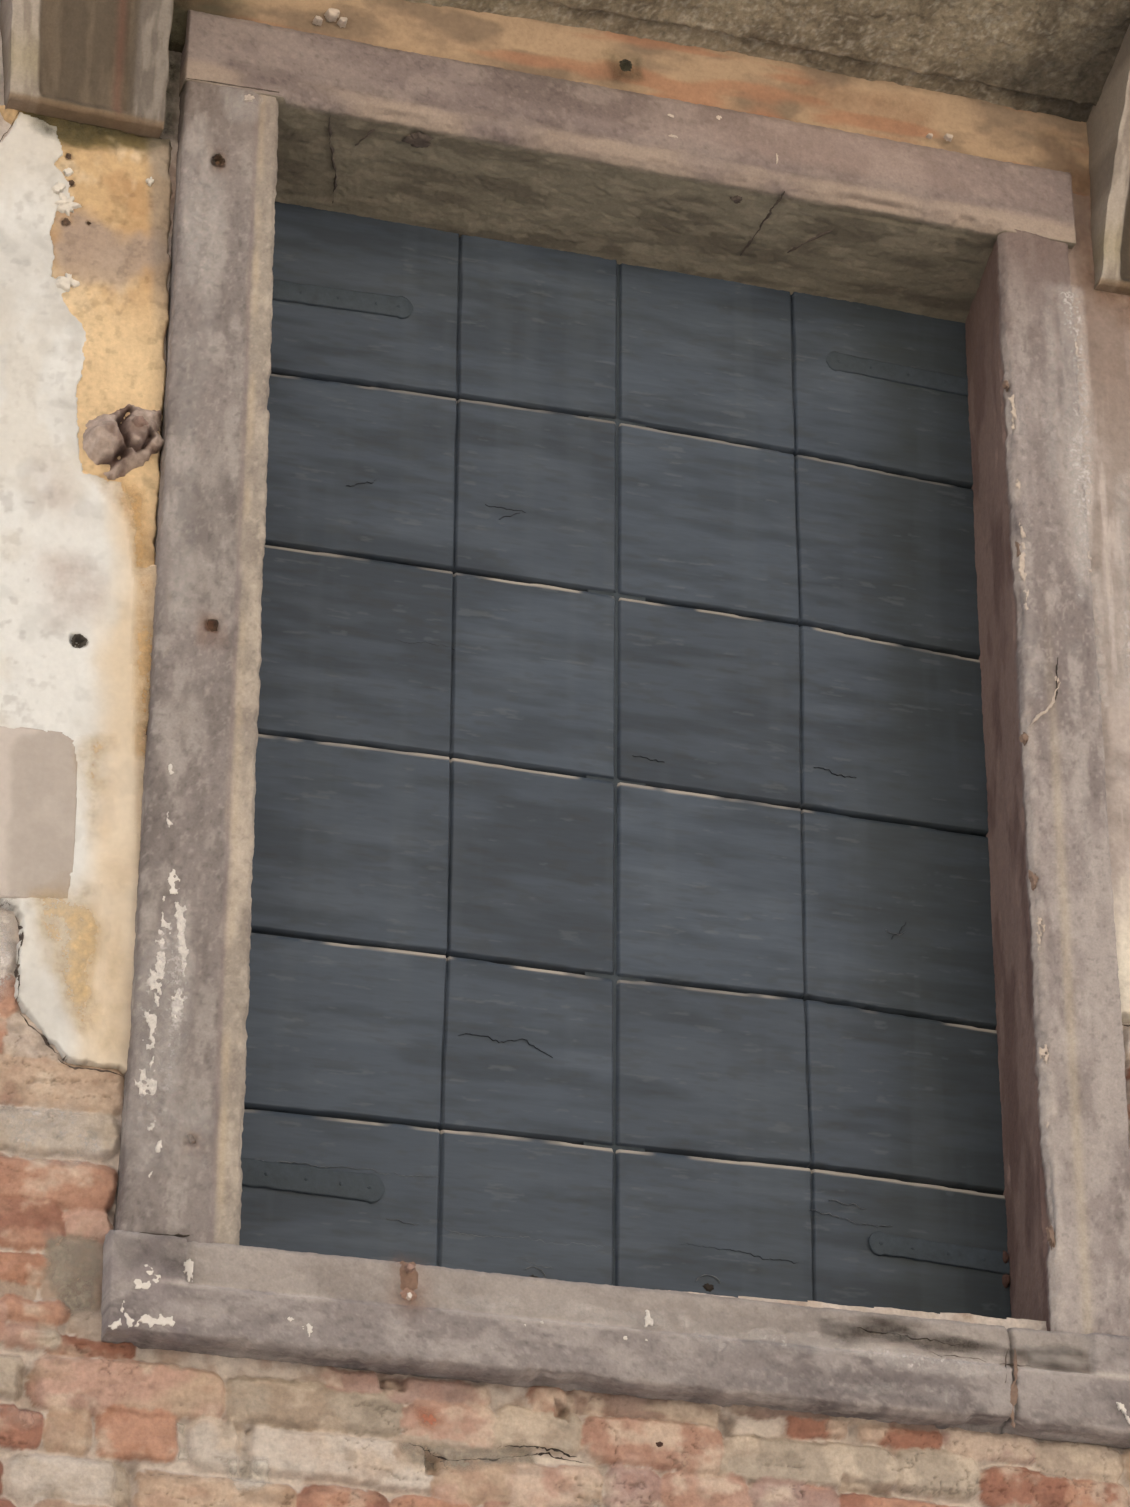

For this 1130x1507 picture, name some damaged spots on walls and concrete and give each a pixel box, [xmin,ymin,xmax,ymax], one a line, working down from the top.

crack [328,115,375,203]
crack [740,191,832,256]
flaking render [0,105,172,568]
peeling [135,869,189,1096]
crack [858,1327,1034,1428]